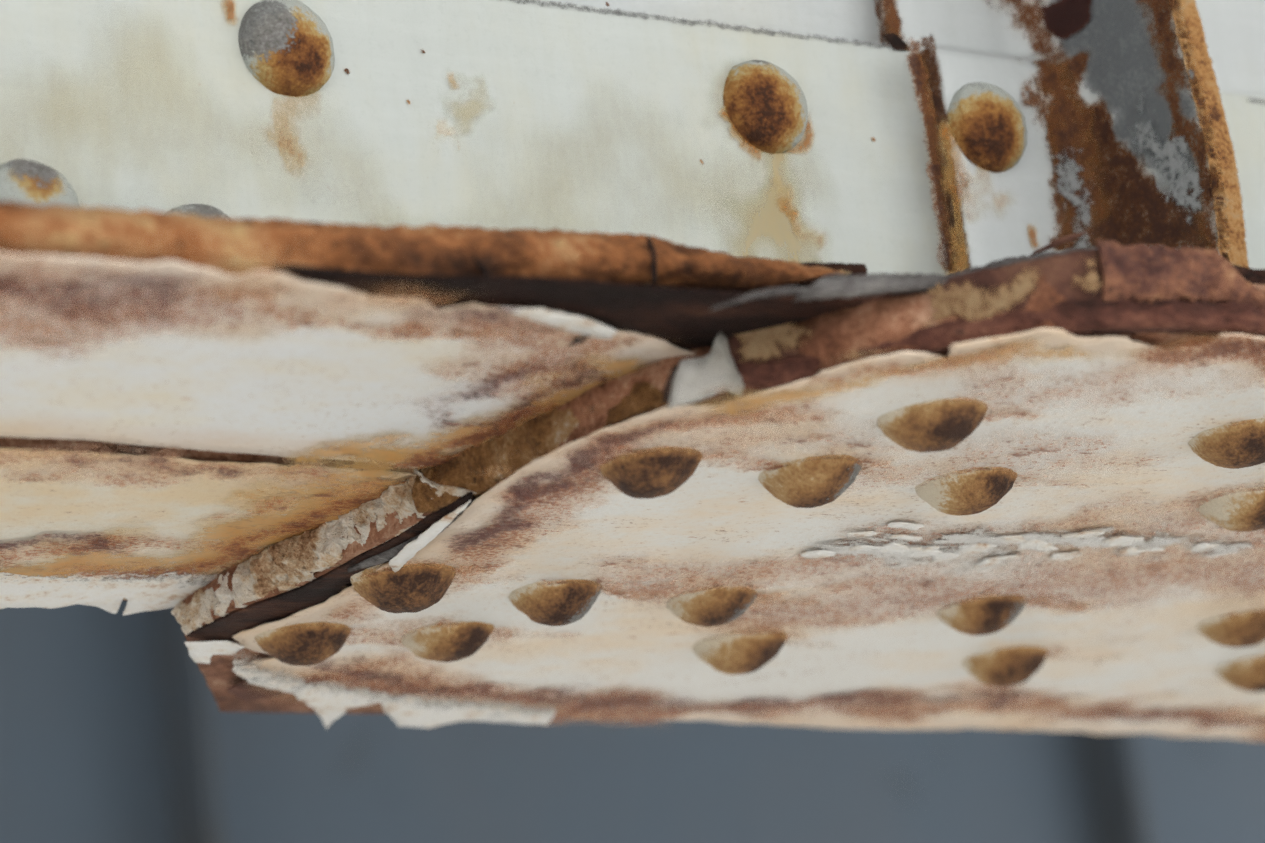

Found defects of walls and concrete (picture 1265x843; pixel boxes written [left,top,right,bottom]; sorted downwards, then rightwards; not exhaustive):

corrosion [225,0,235,22]
corrosion [721,110,813,263]
corrosion [875,0,1249,330]
spalling [272,262,867,409]
crack [662,364,678,405]
corrosion [0,286,1265,595]
peeling [0,563,217,615]
peeling [389,500,471,572]
corrosion [588,491,1265,646]
peeling [796,522,1253,574]
peeling [184,640,557,730]